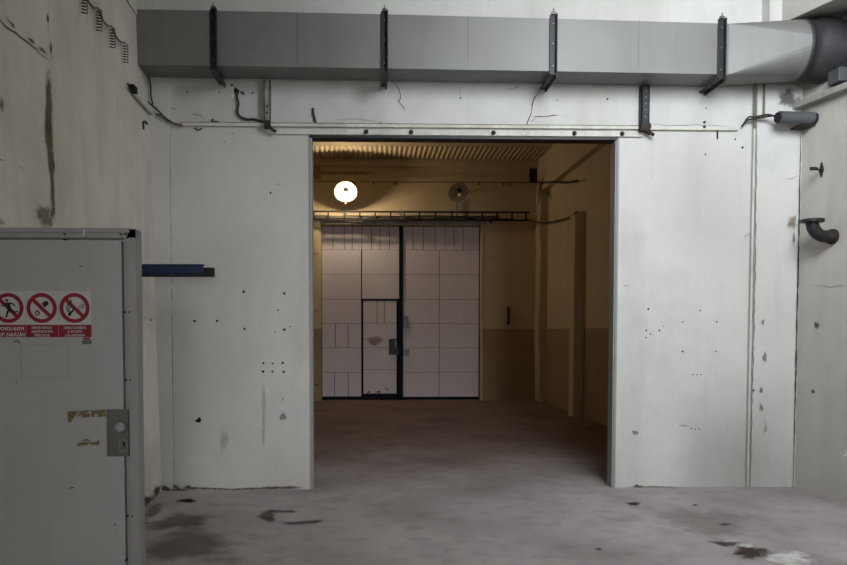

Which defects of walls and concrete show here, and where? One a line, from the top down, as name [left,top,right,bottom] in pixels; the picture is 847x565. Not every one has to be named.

crack [0,20,51,62]
crack [513,86,555,137]
damp [39,79,55,225]
damp [145,485,298,506]
damp [715,540,754,548]
damp [763,551,814,565]